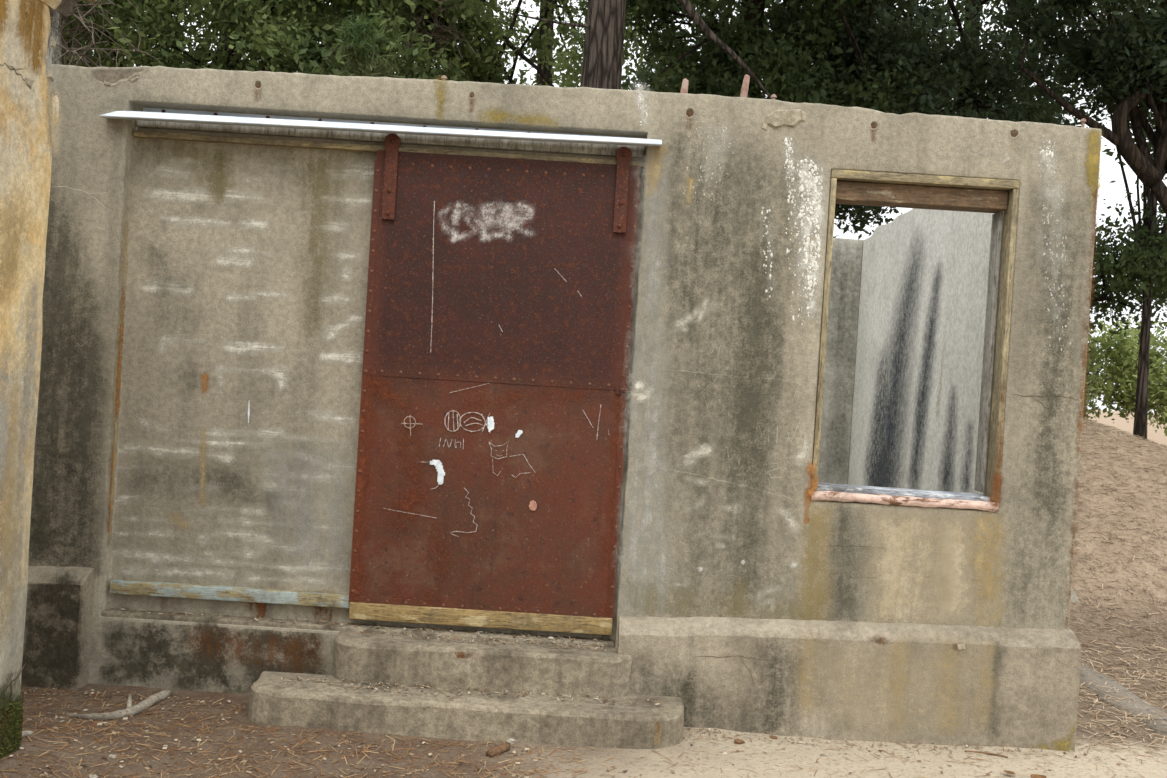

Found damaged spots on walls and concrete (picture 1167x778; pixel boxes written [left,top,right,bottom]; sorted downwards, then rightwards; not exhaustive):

crack [0,63,42,102]
leakage [19,0,43,69]
leakage [0,201,103,688]
rust [109,223,127,537]
rust [350,376,374,601]
leakage [683,115,847,615]
rust [805,463,818,522]
leakage [1035,135,1071,526]